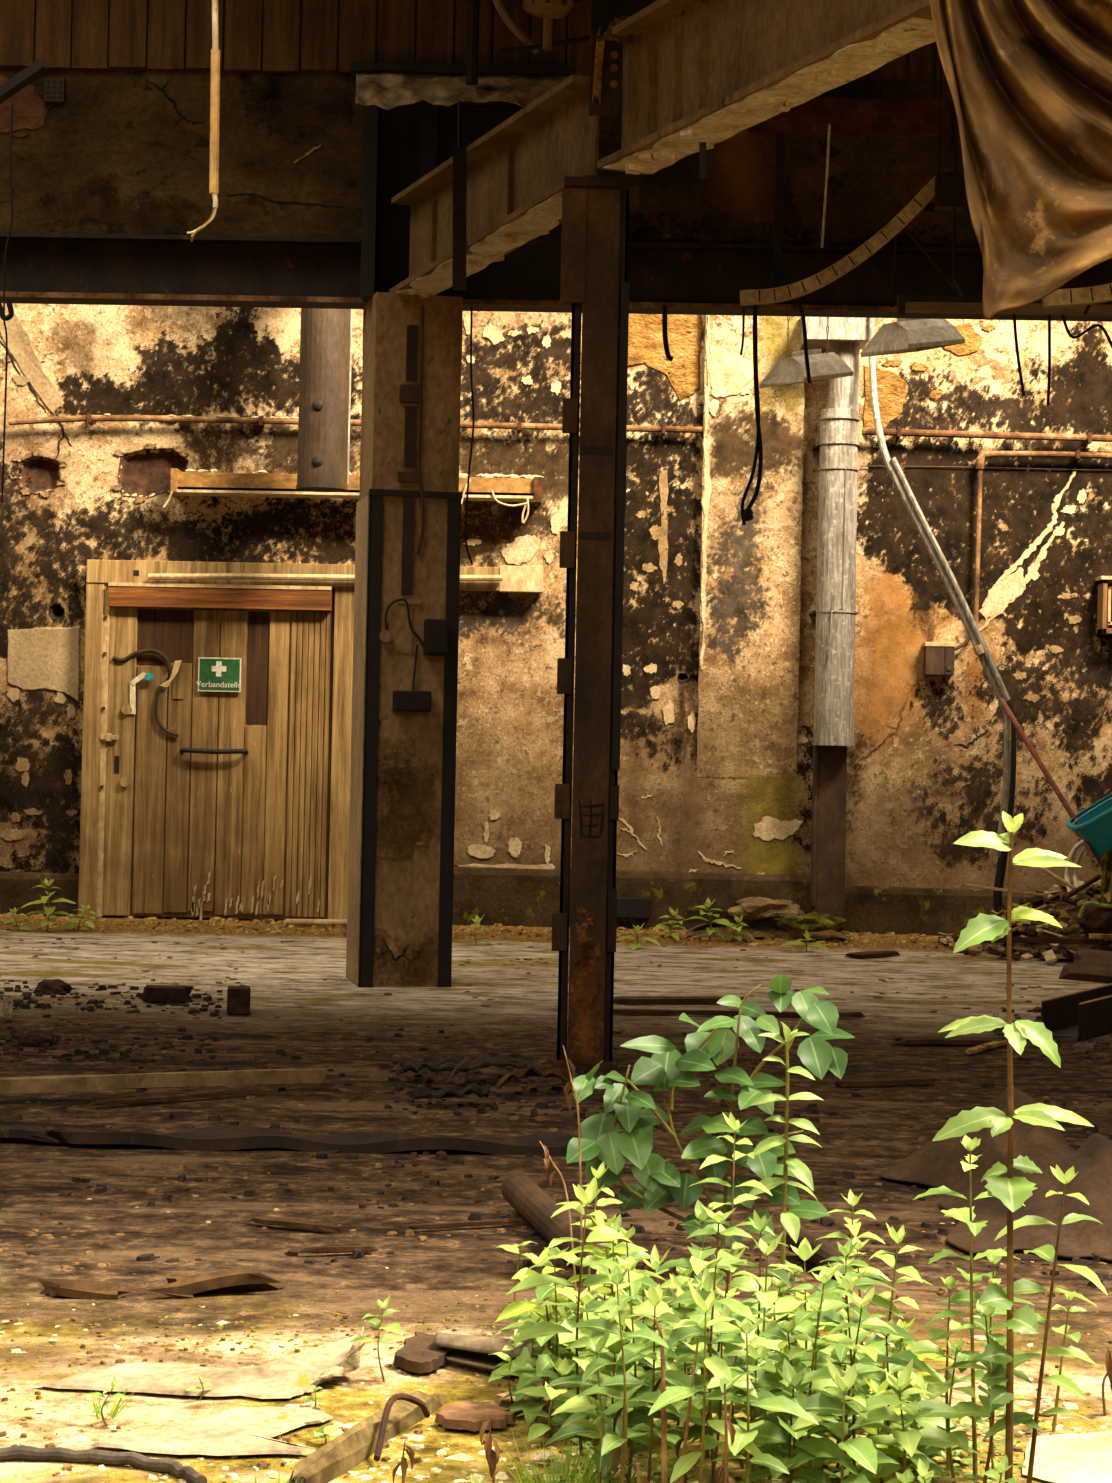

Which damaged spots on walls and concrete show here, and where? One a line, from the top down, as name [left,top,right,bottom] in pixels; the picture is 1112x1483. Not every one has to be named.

flaking render [0,75,54,139]
damp [52,306,300,443]
damp [350,350,362,434]
damp [460,313,582,450]
peeling [9,449,68,498]
damp [0,441,359,658]
damp [621,366,781,859]
damp [856,321,1112,873]
flaking render [1013,671,1040,702]
flaking render [979,472,1087,631]
damp [0,682,84,874]
rust [567,905,604,1062]